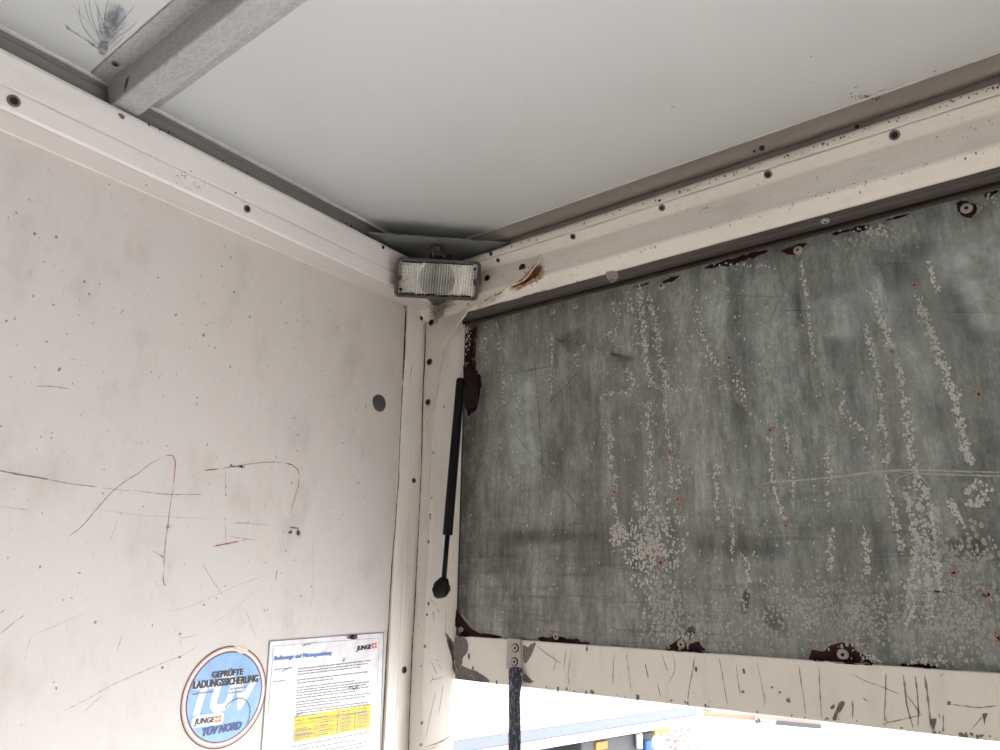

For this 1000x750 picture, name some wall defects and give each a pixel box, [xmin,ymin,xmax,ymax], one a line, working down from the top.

corrosion [512,265,548,290]
peeling [445,633,498,685]